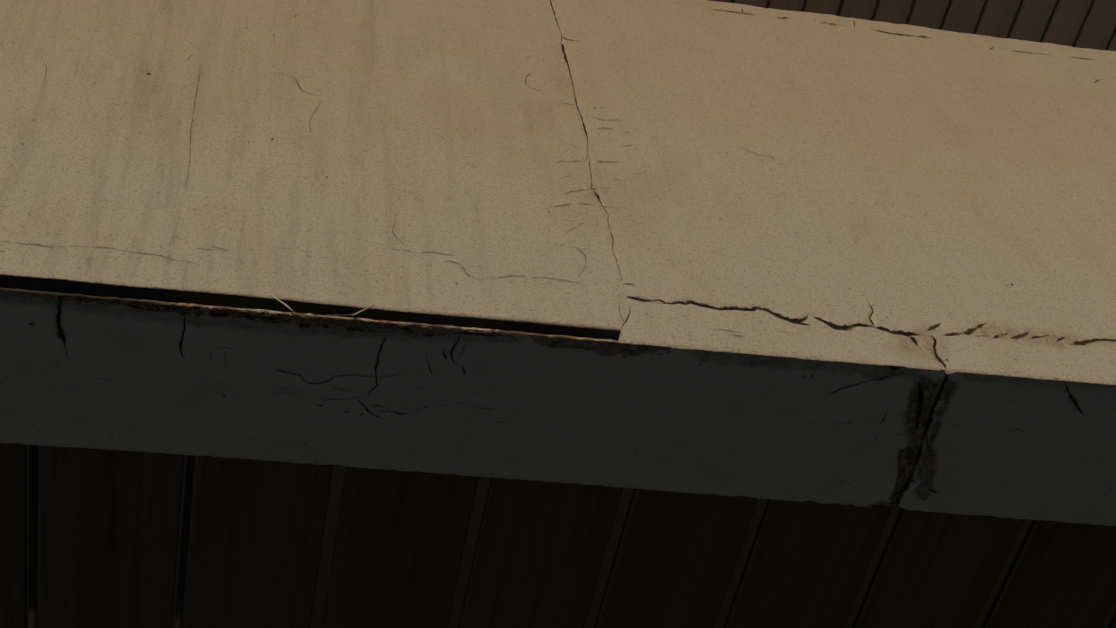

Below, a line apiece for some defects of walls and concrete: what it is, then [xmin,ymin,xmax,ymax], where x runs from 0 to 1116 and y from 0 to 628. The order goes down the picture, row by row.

crack [392,0,1116,368]
crack [56,296,68,359]
crack [178,317,234,367]
crack [270,338,400,394]
spalling [58,295,672,357]
crack [426,335,466,375]
crack [1065,383,1084,415]